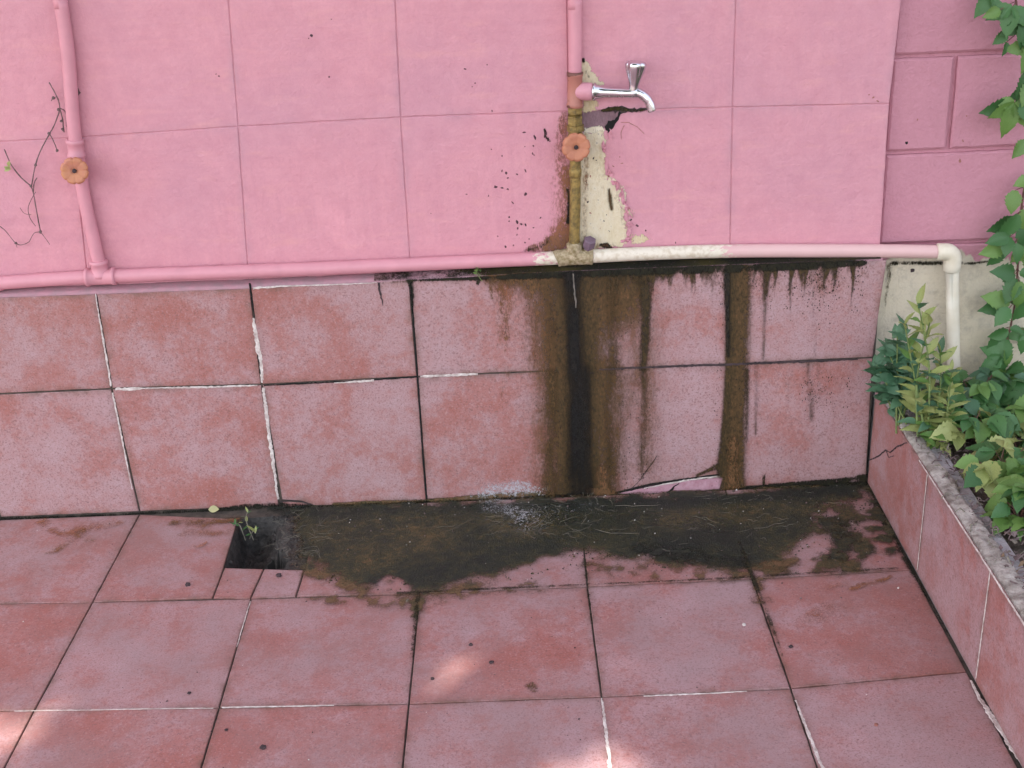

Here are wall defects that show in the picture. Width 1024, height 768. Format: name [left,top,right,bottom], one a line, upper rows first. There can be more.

peeling [582,58,604,86]
rust [528,119,570,252]
peeling [580,100,649,249]
damp [333,260,867,527]
crack [616,456,718,494]
crack [868,442,907,461]
spalling [225,515,308,570]